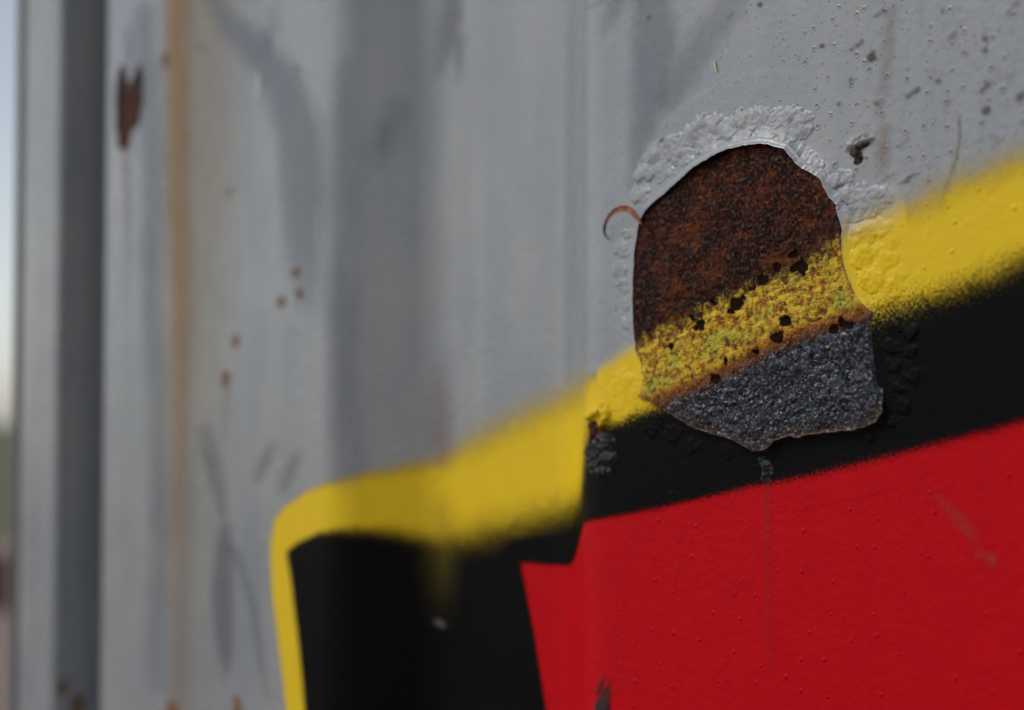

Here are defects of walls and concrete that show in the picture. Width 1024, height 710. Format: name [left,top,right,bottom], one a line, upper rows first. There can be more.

peeling [583,67,941,526]